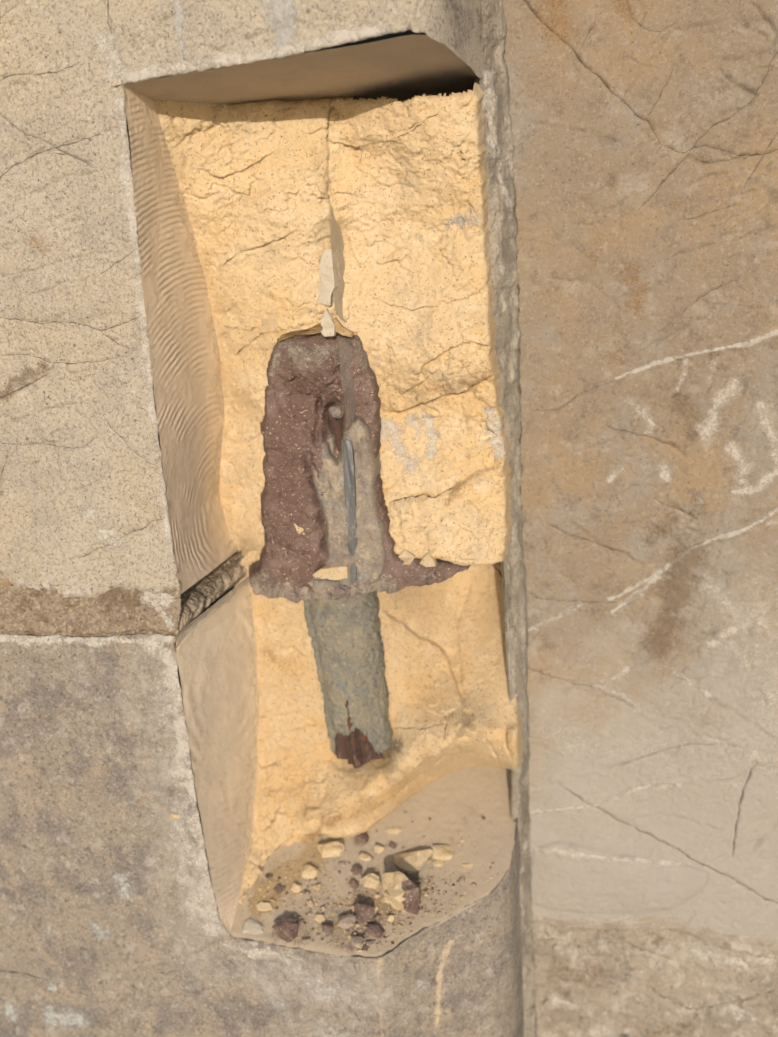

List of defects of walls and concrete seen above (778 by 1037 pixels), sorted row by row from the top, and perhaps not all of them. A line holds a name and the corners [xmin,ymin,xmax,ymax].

crack [2,42,104,80]
crack [502,0,778,222]
crack [0,114,102,178]
crack [0,317,136,398]
peeling [278,309,354,342]
crack [0,413,154,480]
crack [518,381,642,564]
crack [74,519,163,559]
spalling [313,565,349,580]
spalling [398,549,437,567]
corrosion [335,692,384,768]
crack [559,743,778,903]